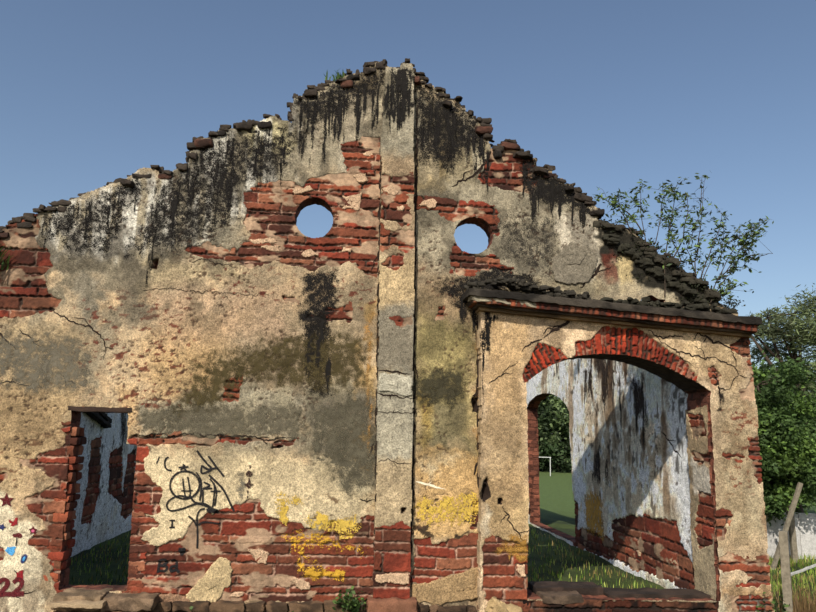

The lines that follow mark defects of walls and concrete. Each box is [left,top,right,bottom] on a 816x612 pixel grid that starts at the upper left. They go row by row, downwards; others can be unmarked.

spalling [0,214,62,318]
crack [51,310,113,360]
damp [120,267,377,496]
damp [38,65,490,296]
spalling [185,136,500,278]
crack [360,105,419,594]
spalling [523,326,698,382]
damp [578,358,649,442]
crack [648,330,748,404]
spalling [19,421,72,593]
spalling [81,431,719,612]
damp [584,443,610,541]